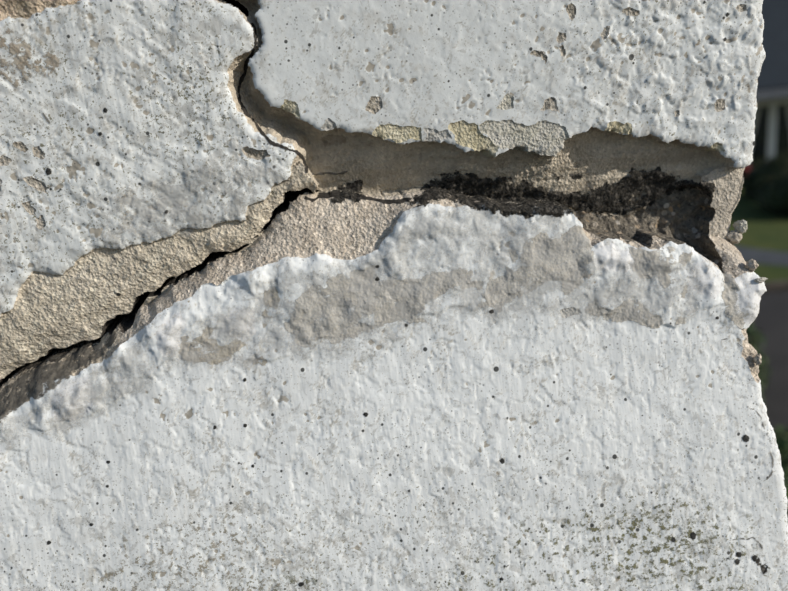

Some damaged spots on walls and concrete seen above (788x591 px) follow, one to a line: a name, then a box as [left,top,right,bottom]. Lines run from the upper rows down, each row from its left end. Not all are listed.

crack [0,0,432,388]
water stain [331,180,363,203]
spalling [0,0,768,409]
water stain [409,166,716,219]